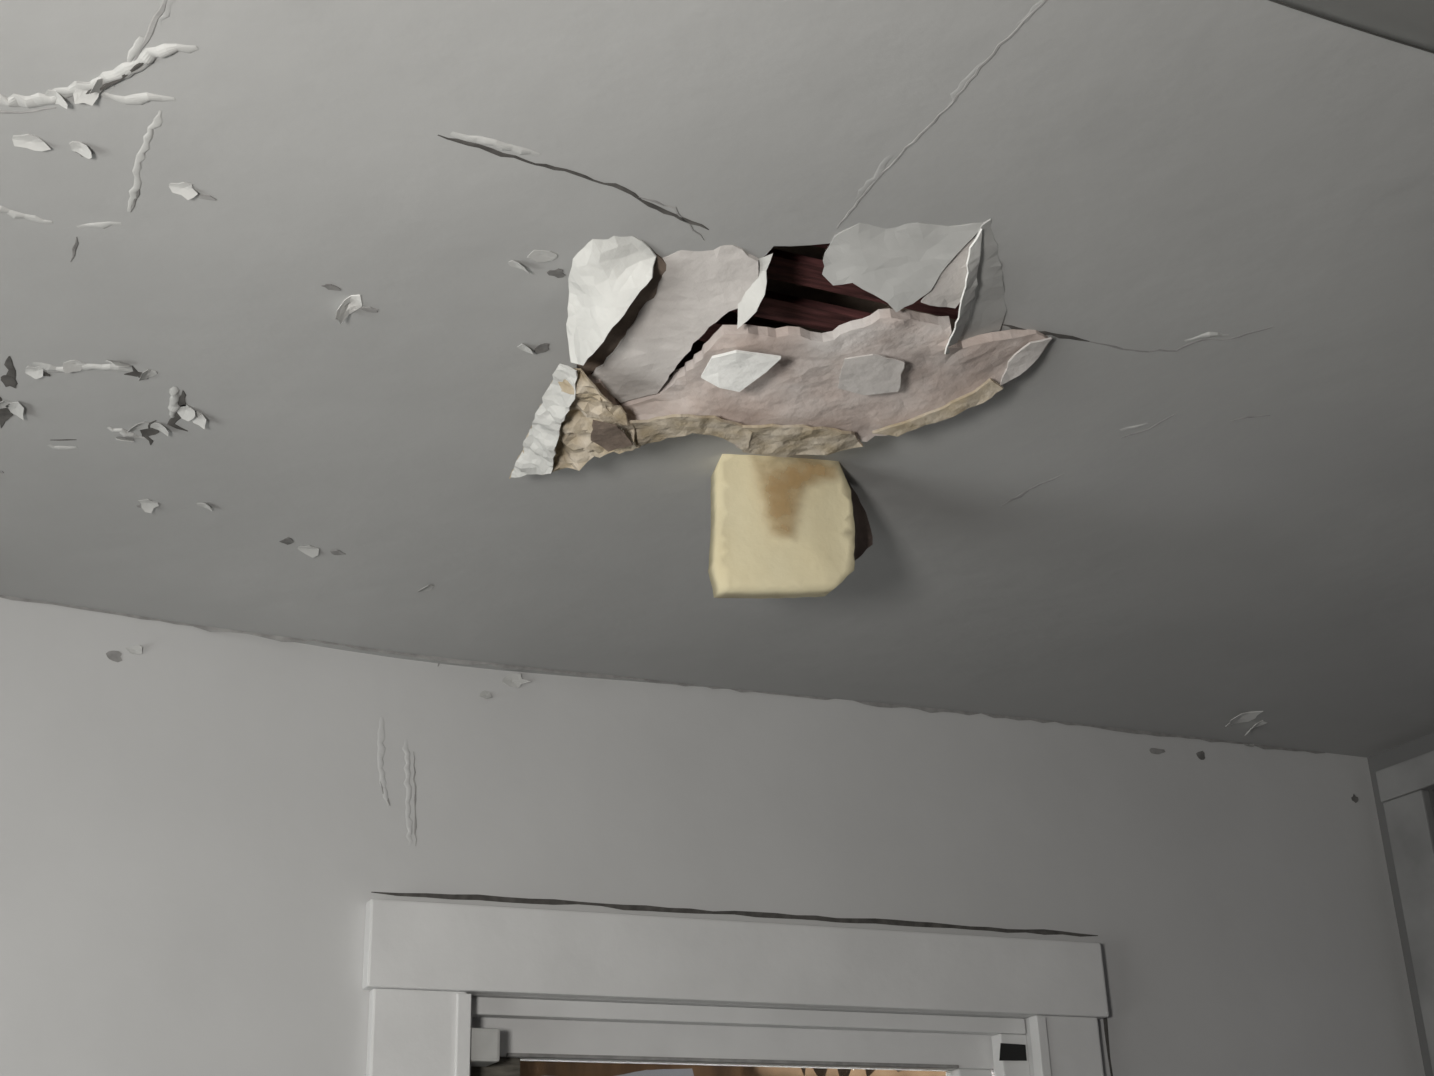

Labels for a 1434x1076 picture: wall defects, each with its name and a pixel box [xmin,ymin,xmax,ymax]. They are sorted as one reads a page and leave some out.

crack [133,0,176,61]
crack [837,0,1047,228]
peeling [0,36,199,262]
crack [438,131,709,240]
spalling [772,245,827,260]
spalling [721,311,827,333]
spalling [766,278,956,338]
spalling [669,340,706,378]
peeling [0,356,158,428]
crack [377,717,417,846]
crack [371,892,1098,937]
crack [1103,1017,1113,1076]